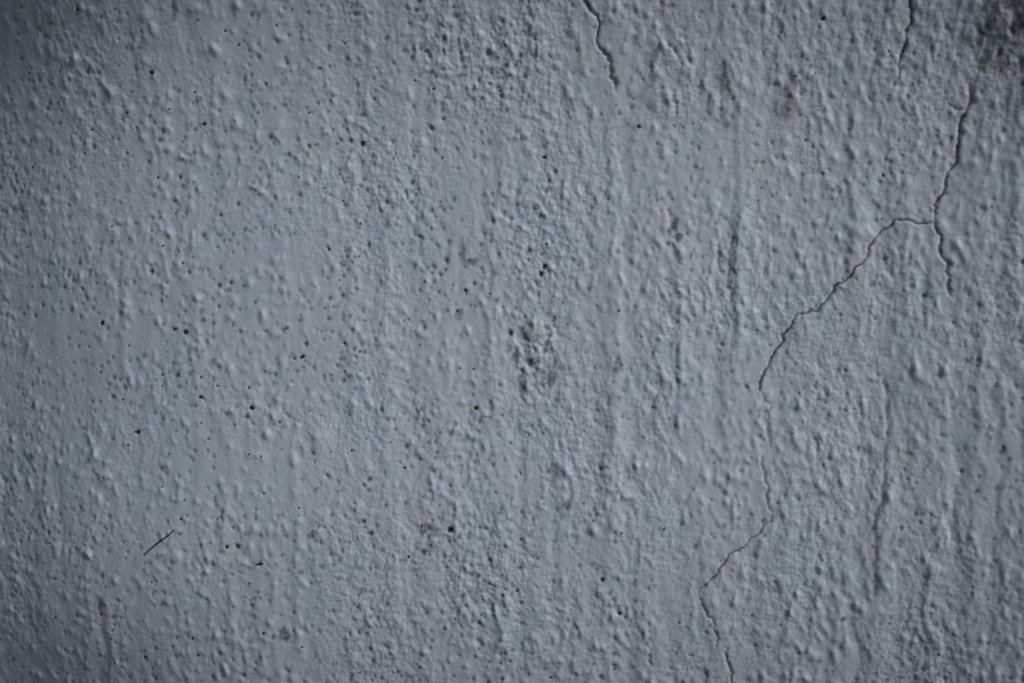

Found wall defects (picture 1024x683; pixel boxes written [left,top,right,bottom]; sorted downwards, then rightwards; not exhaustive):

crack [583,0,618,87]
crack [759,87,973,386]
crack [702,603,733,683]